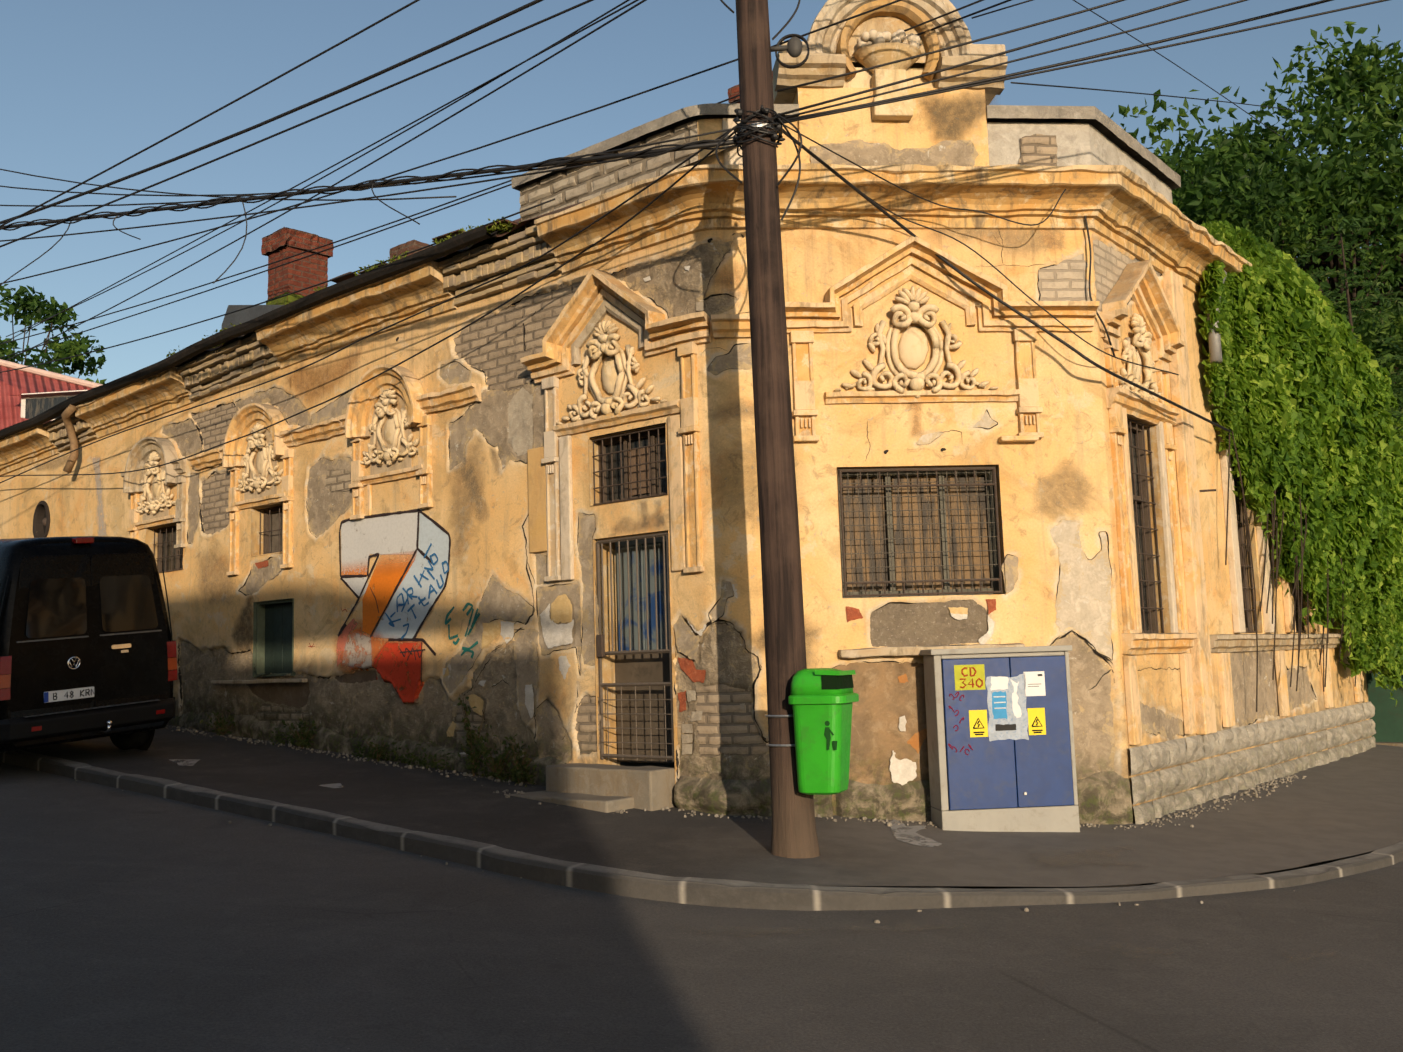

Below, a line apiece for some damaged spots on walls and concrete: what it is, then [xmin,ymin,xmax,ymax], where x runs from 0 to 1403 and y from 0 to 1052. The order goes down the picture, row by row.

peeling [611,241,739,320]
peeling [1037,239,1162,312]
peeling [439,361,471,384]
peeling [707,343,752,376]
peeling [448,379,545,470]
peeling [306,457,352,538]
spalling [177,512,599,764]
spalling [674,580,770,781]
spalling [833,554,1019,785]
peeling [1049,519,1116,779]